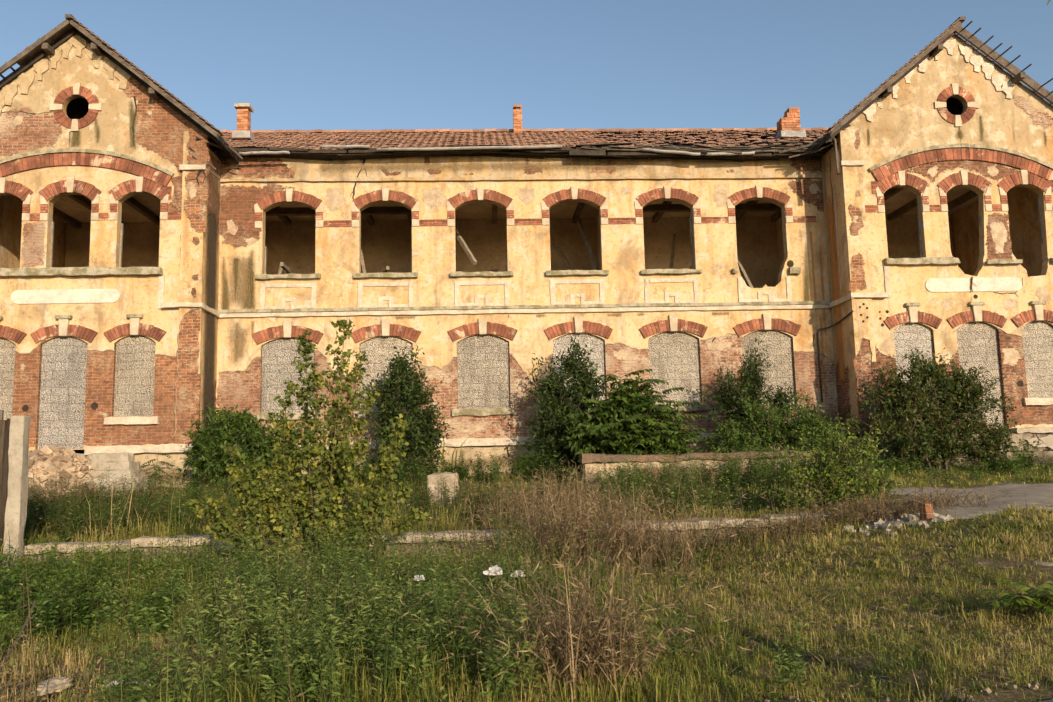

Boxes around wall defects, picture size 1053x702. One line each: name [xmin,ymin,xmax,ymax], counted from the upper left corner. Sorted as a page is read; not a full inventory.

spalling [0,34,295,247]
spalling [788,152,827,212]
spalling [849,252,867,292]
spalling [985,213,1012,260]
spalling [12,339,46,448]
spalling [84,275,201,446]
spalling [213,350,388,442]
spalling [411,353,554,439]
spalling [605,341,650,399]
spalling [657,332,748,433]
spalling [762,337,902,429]
spalling [999,328,1053,449]